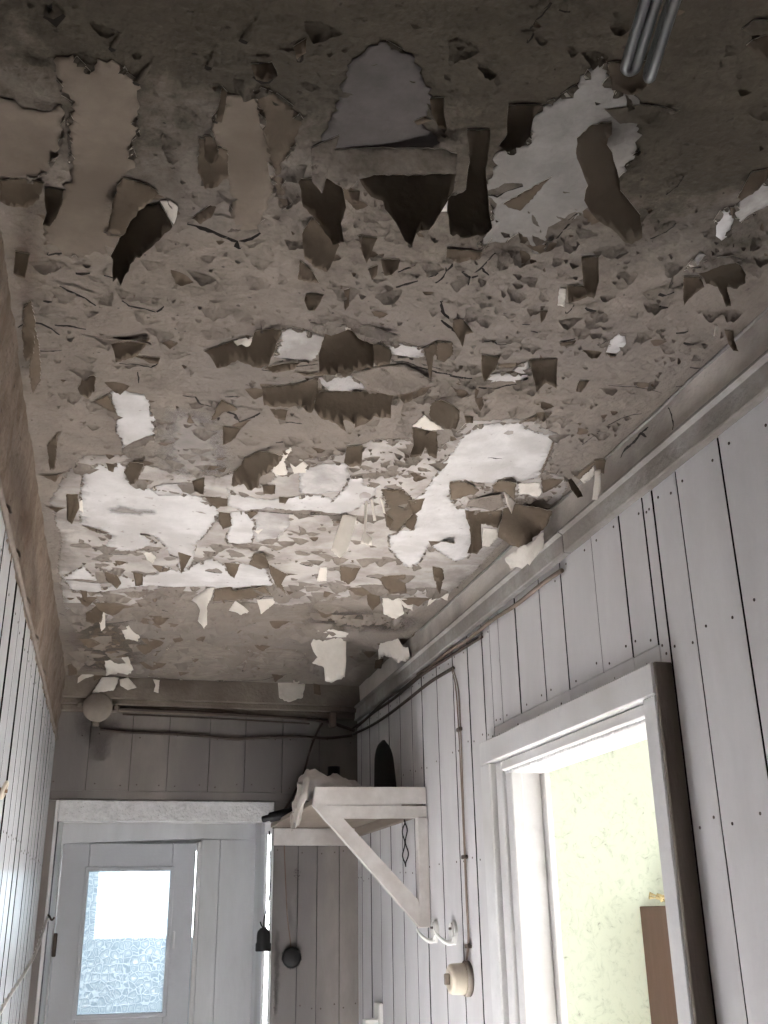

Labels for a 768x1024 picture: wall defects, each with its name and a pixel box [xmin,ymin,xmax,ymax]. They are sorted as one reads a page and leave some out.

flaking render [0,22,768,702]
peeling [609,12,633,36]